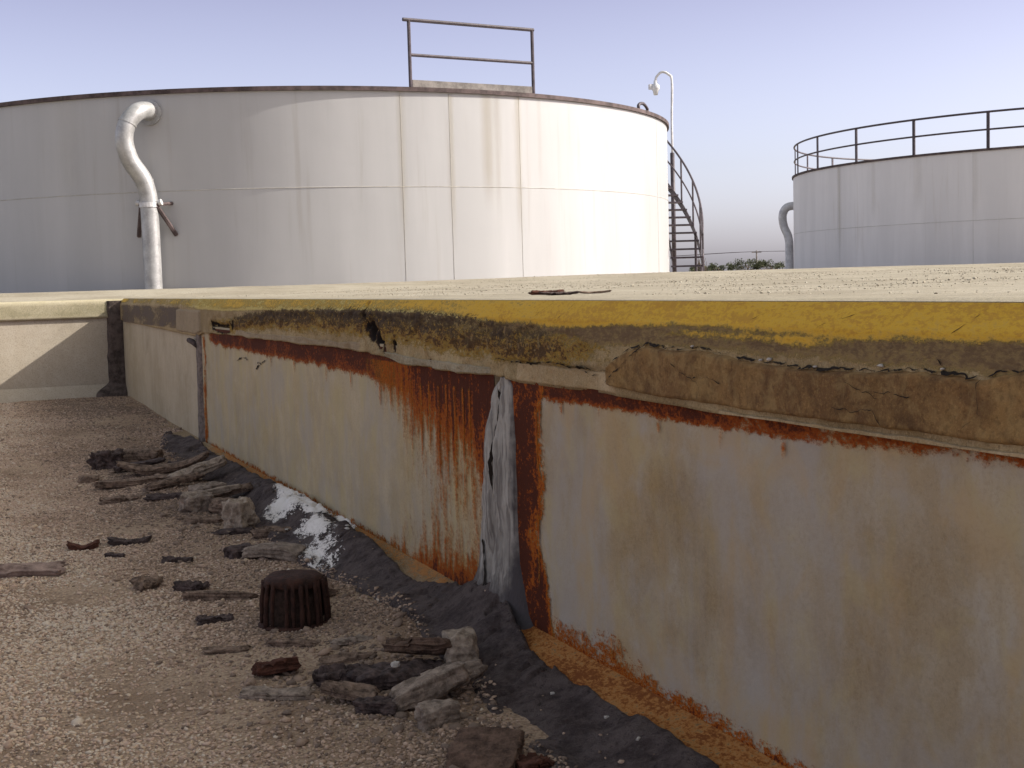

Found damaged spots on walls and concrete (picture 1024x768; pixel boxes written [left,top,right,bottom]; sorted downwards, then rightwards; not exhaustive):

water stain [228,306,553,347]
peeling [121,299,1024,458]
crack [496,342,1024,432]
rust [203,329,494,585]
crack [488,390,501,490]
water stain [263,483,357,572]
crack [480,539,488,586]
rust [511,380,1024,768]